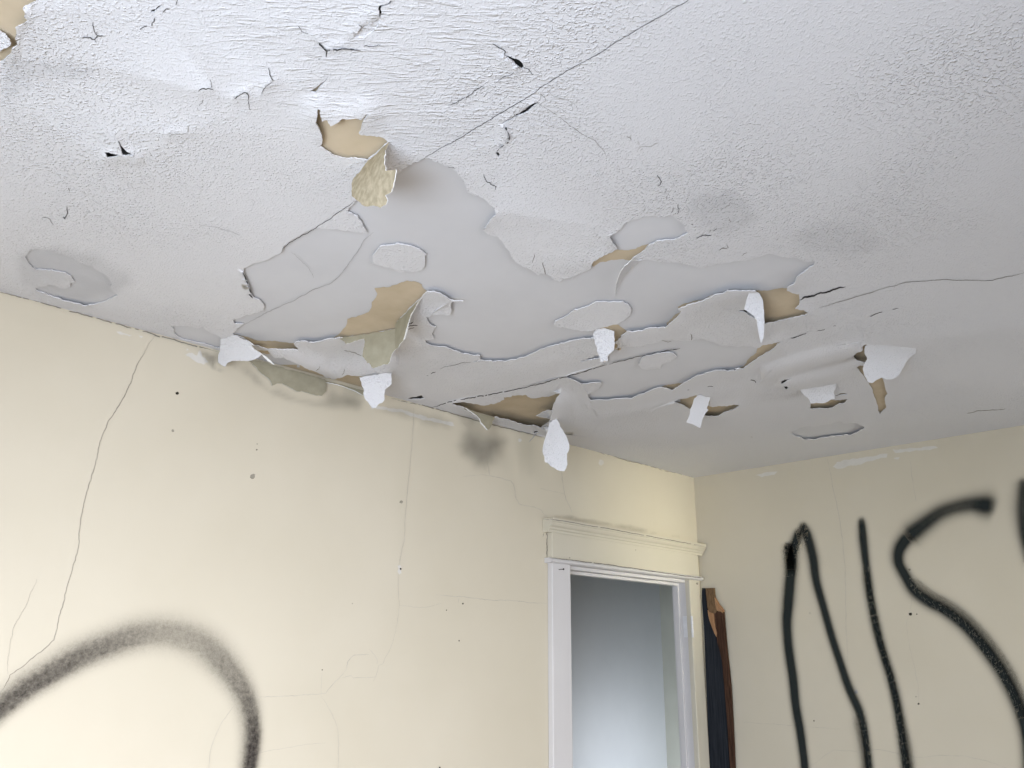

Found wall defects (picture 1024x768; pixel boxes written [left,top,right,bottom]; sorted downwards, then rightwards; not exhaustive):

peeling [0,0,36,61]
crack [298,26,378,57]
crack [422,0,688,169]
peeling [26,248,116,305]
crack [238,201,369,329]
peeling [232,158,814,437]
crack [792,273,1022,339]
peeling [791,422,864,439]
peeling [810,393,847,408]
peeling [854,345,887,412]
crack [0,292,217,693]